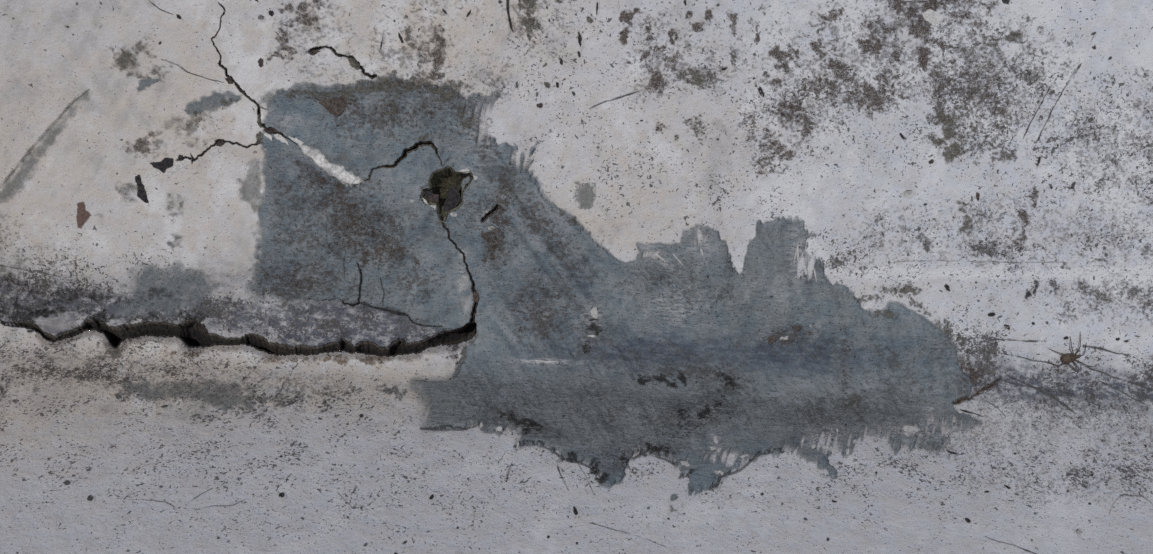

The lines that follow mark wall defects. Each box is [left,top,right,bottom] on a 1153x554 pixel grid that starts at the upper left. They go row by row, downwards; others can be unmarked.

crack [135,3,442,206]
damp [279,161,429,302]
crack [0,215,480,379]
damp [577,319,628,357]
damp [857,282,997,385]
damp [196,368,357,416]
damp [497,396,542,434]
damp [601,343,745,438]
damp [590,458,609,483]